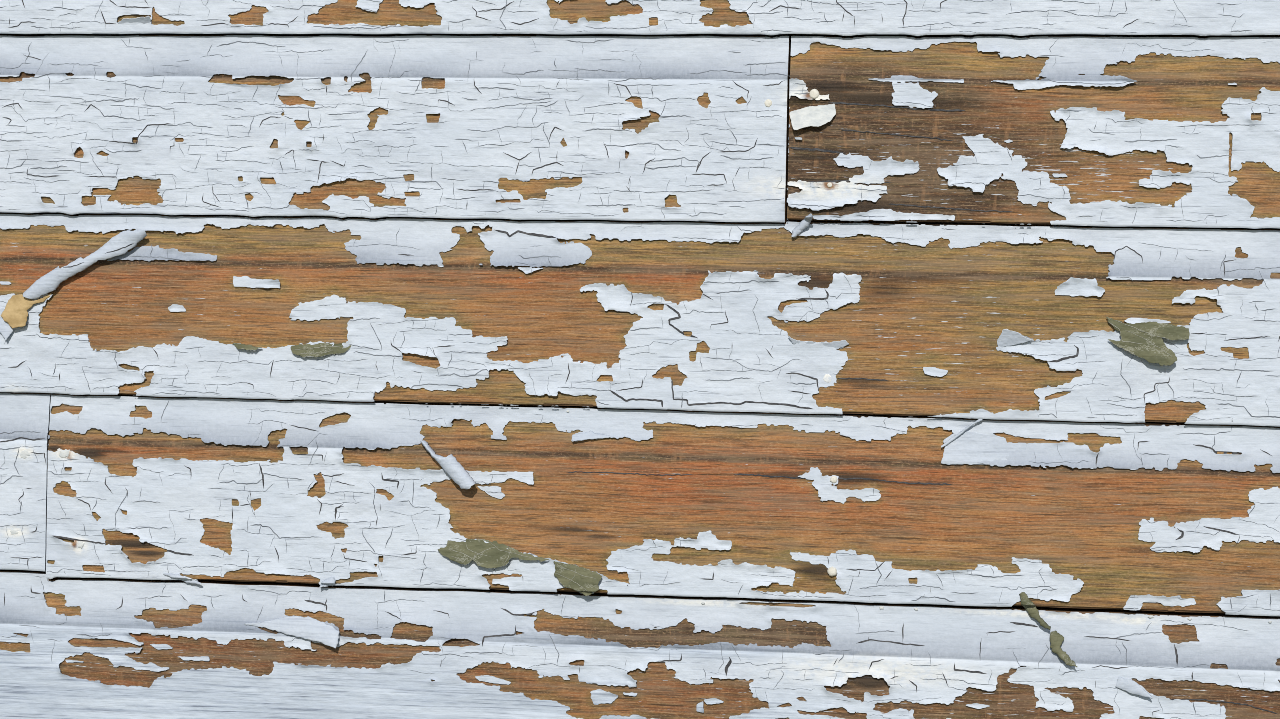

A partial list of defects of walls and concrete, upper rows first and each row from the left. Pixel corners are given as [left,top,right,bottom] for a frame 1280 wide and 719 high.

peeling [307,0,442,27]
peeling [547,0,658,26]
peeling [699,0,753,27]
peeling [0,42,1280,415]
peeling [48,364,308,477]
peeling [1144,400,1206,422]
crack [0,271,1280,719]
peeling [92,512,383,588]
peeling [342,419,1280,667]
peeling [59,604,480,688]
peeling [457,660,1115,719]
peeling [1115,658,1280,719]